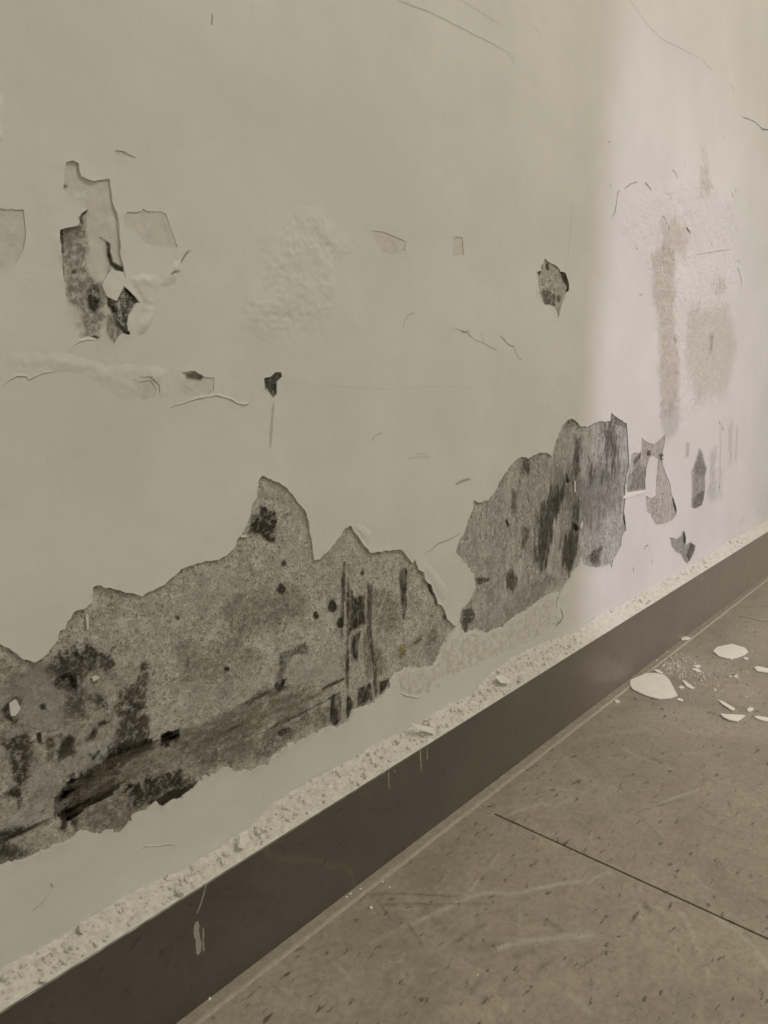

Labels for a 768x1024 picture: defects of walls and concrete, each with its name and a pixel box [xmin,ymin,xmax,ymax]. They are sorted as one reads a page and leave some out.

peeling [0,208,25,266]
peeling [60,161,177,352]
spalling [537,260,569,314]
spalling [264,372,281,397]
peeling [691,449,706,509]
peeling [670,531,695,563]
peeling [0,414,677,864]